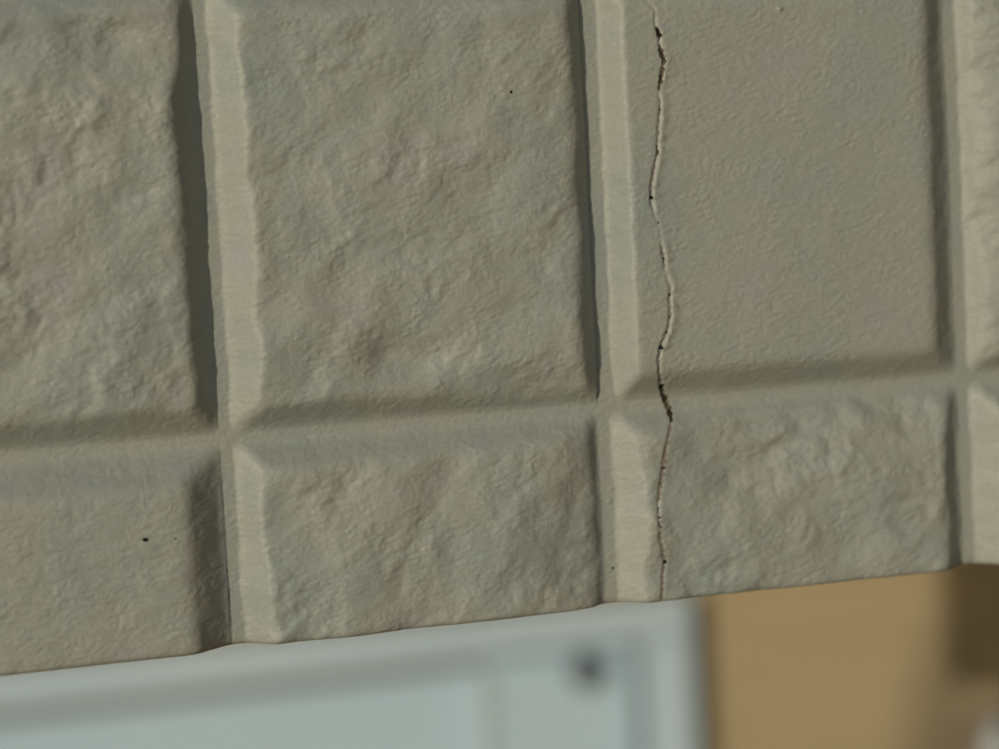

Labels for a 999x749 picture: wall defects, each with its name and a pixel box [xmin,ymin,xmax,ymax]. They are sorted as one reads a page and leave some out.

crack [649,27,673,600]